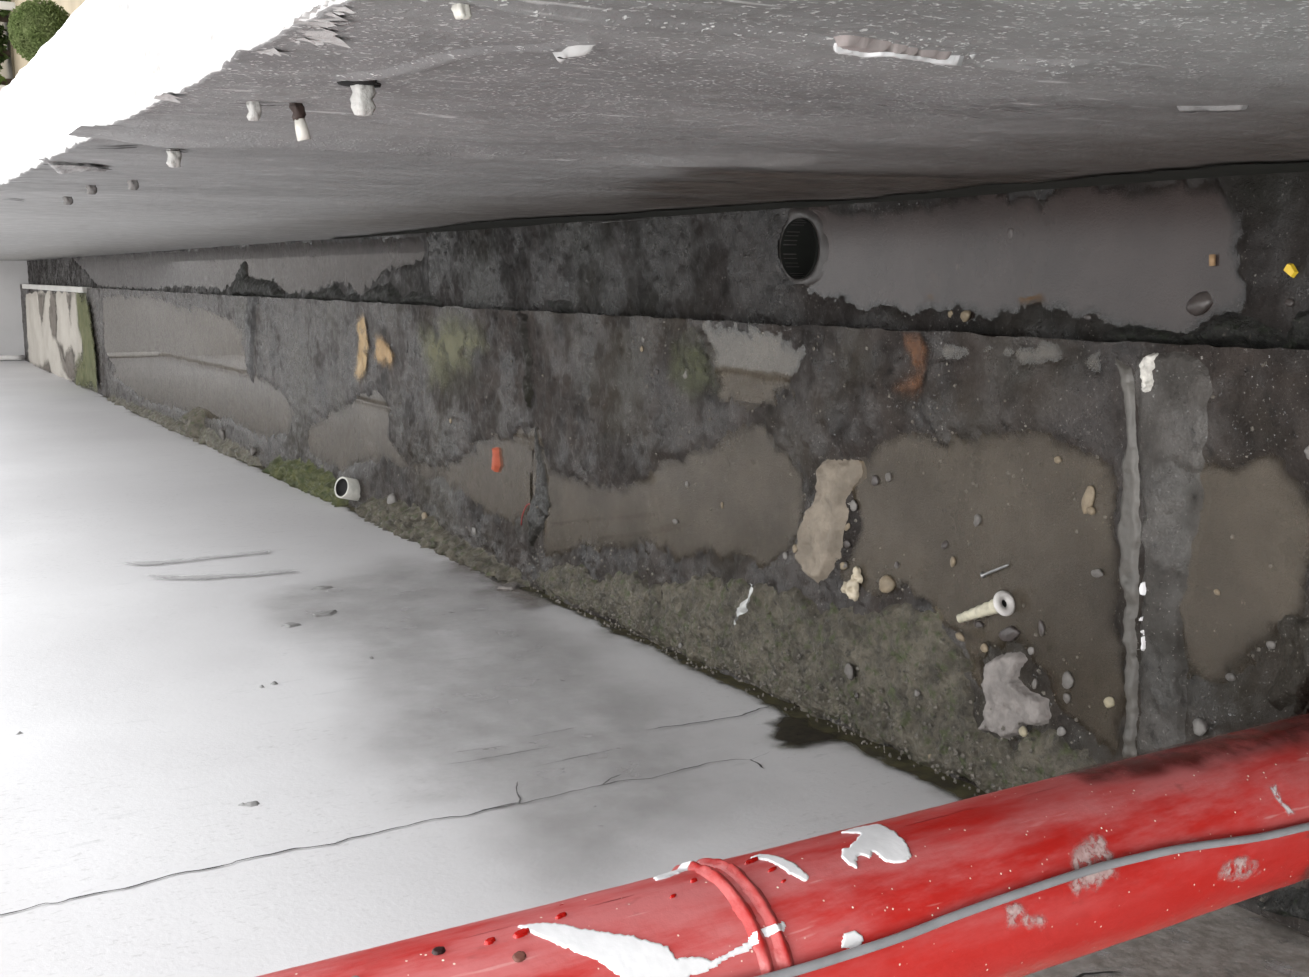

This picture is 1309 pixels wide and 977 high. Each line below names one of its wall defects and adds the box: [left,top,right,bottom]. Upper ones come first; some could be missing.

spalling [244,0,355,56]
peeling [833,35,976,66]
damp [38,292,81,380]
corrosion [901,335,925,392]
crack [644,707,767,731]
damp [772,707,841,746]
crack [0,728,763,915]